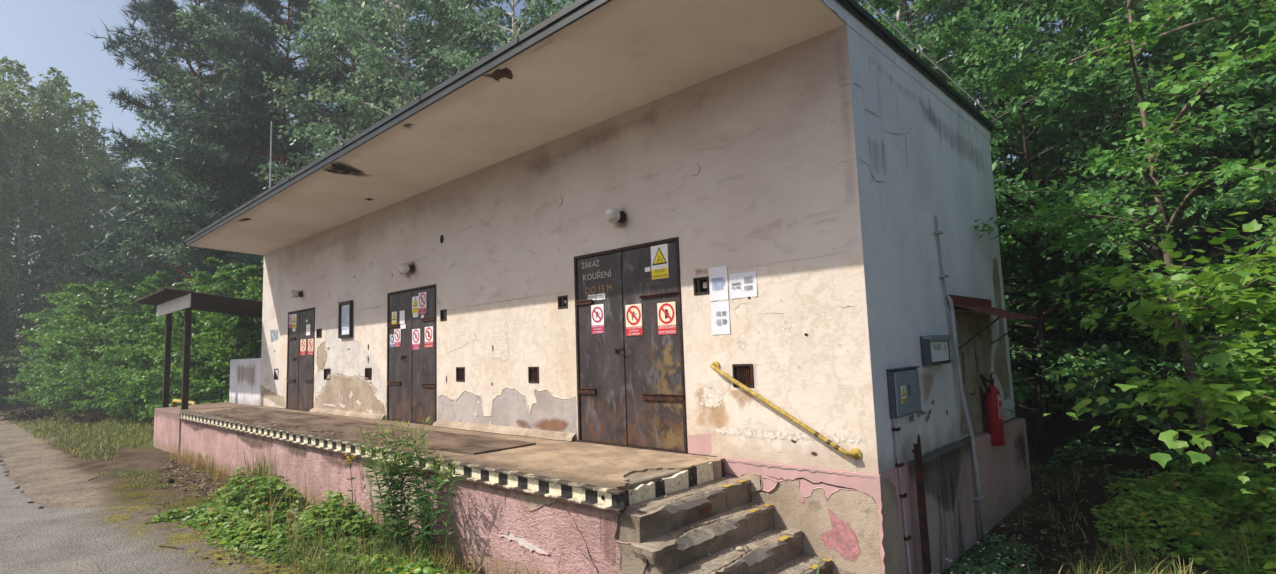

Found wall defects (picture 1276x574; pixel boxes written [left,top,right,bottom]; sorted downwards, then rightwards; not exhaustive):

spalling [481,65,517,83]
peeling [314,312,387,419]
peeling [437,376,577,440]
crack [673,461,876,540]
peeling [737,473,899,574]
spalling [681,557,734,574]